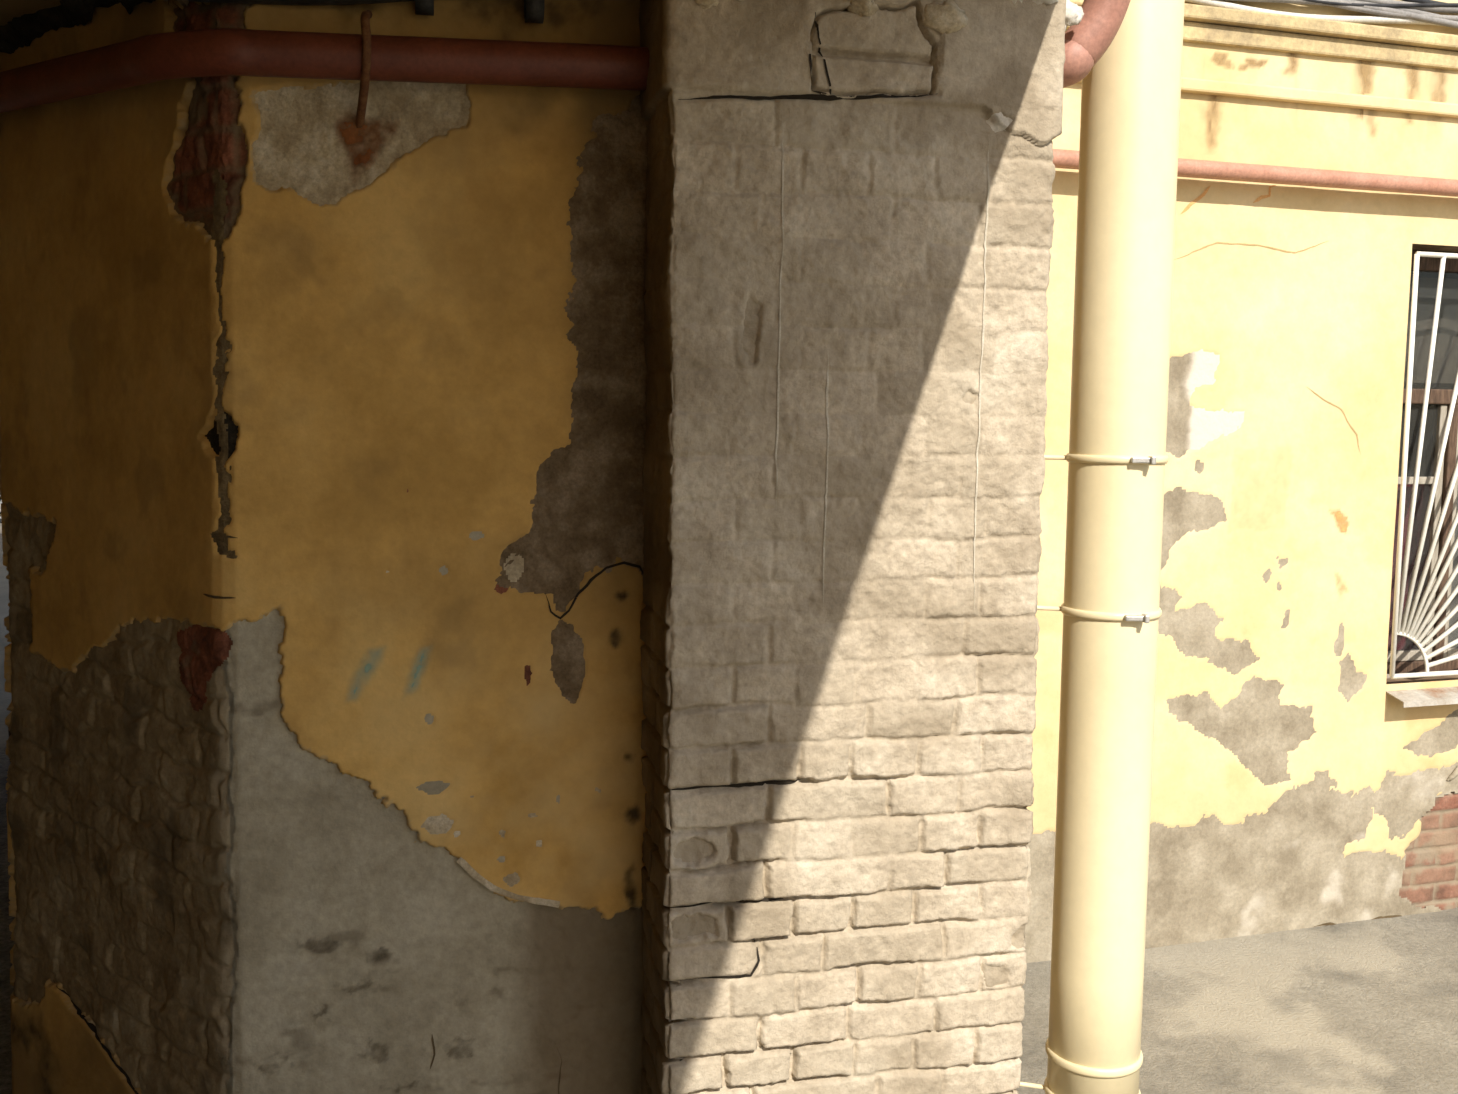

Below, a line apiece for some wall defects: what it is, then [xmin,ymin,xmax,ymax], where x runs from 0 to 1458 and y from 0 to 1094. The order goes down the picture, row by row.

flaking render [810,5,933,96]
peeling [167,76,471,239]
spalling [986,112,1013,132]
flaking render [494,95,648,704]
peeling [1166,349,1245,474]
peeling [1158,487,1317,786]
peeling [1334,623,1367,702]
flaking render [4,502,645,1094]
flaking render [1399,709,1458,910]
crack [53,980,138,1094]
crack [428,1035,436,1069]